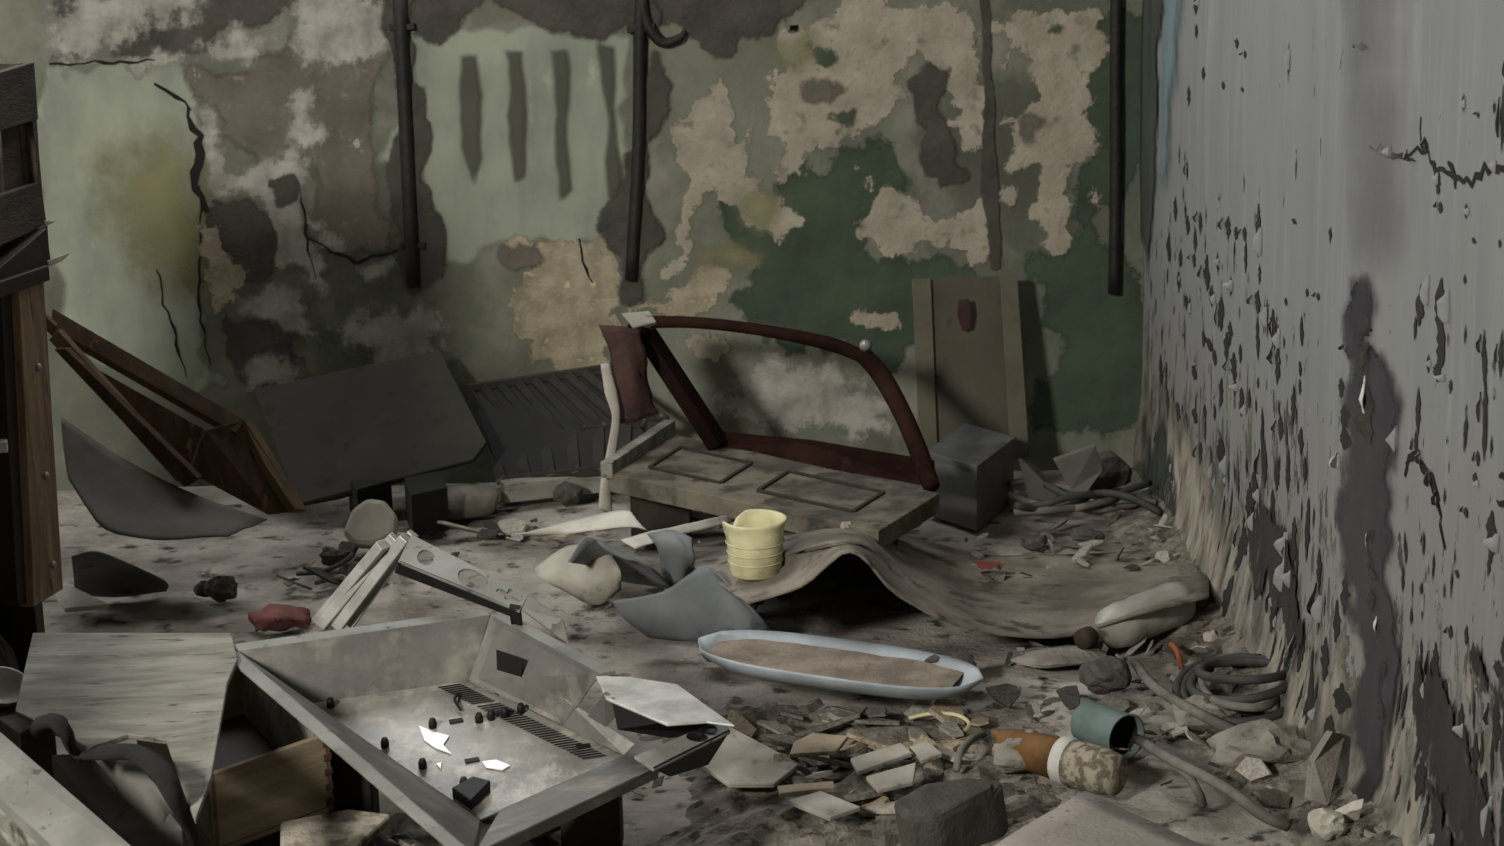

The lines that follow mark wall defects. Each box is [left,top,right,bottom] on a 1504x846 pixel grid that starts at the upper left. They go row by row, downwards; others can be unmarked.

crack [49,59,211,377]
peeling [37,53,346,393]
flaking render [360,258,395,282]
flaking render [498,0,1110,371]
flaking render [1140,0,1351,733]
peeling [1329,376,1366,468]
crack [1380,116,1504,194]
peeling [1385,274,1503,487]
peeling [1461,60,1504,150]
peeling [1483,510,1499,577]
peeling [1390,532,1504,846]